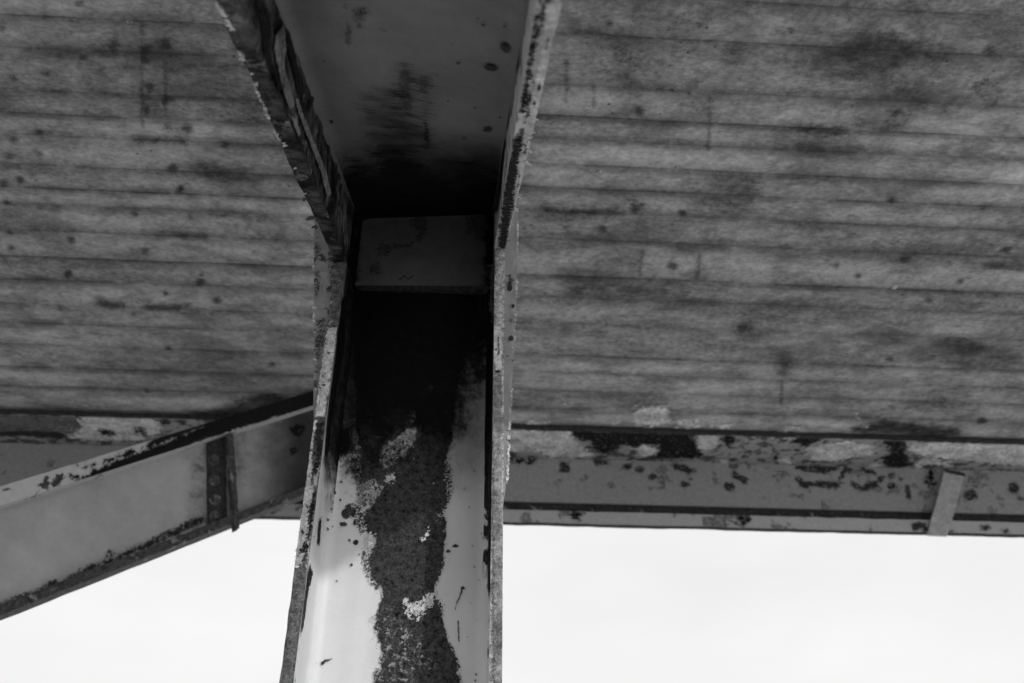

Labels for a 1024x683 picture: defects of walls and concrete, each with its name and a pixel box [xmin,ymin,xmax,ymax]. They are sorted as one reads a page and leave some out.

peeling [60,417,234,486]
peeling [776,440,887,468]
peeling [906,442,1024,469]